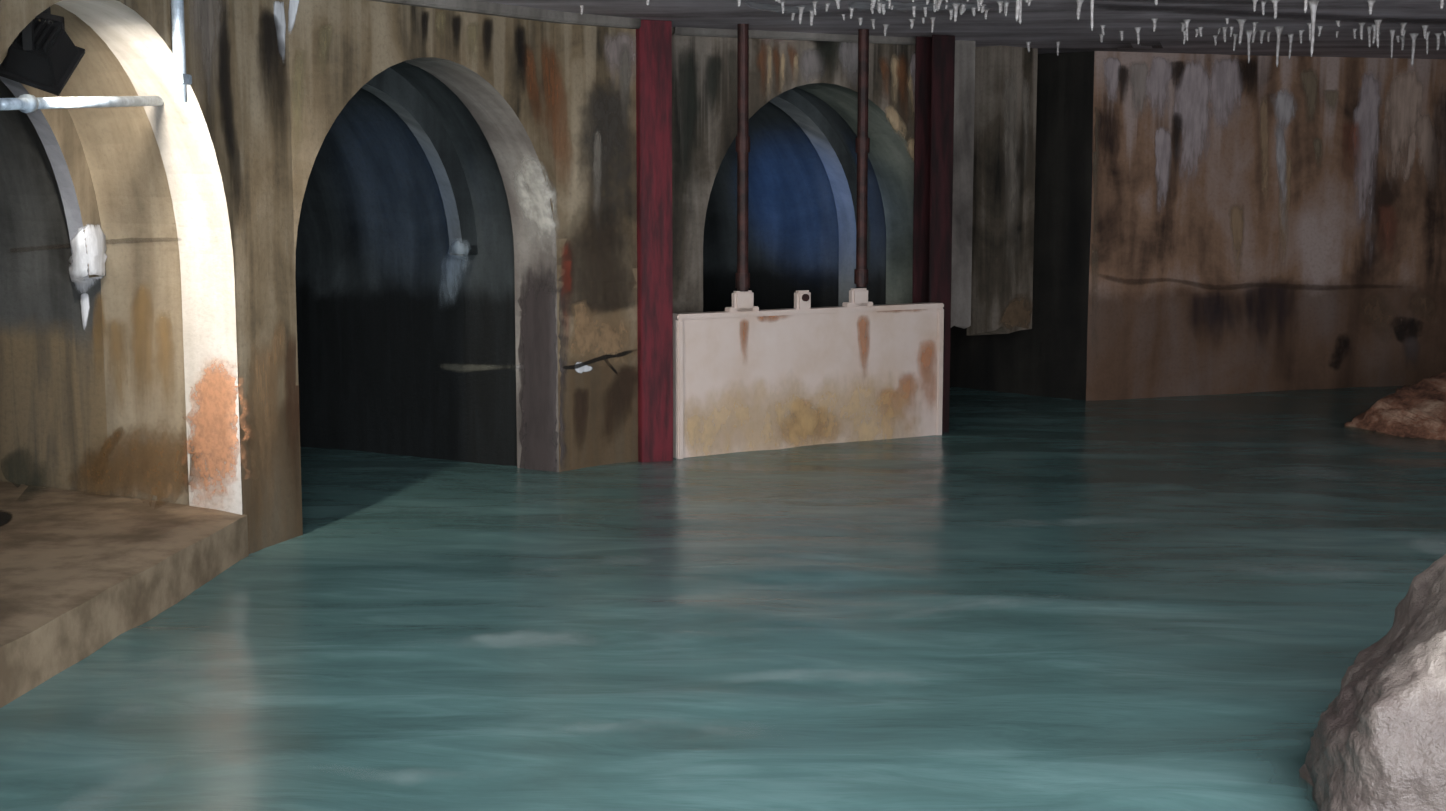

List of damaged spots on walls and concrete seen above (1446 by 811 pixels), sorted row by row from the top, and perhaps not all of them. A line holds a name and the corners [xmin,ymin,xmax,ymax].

damp [1104,45,1255,202]
damp [1276,70,1338,198]
damp [1354,71,1446,217]
corrosion [742,316,778,344]
corrosion [858,318,868,357]
corrosion [882,346,933,413]
damp [81,431,197,500]